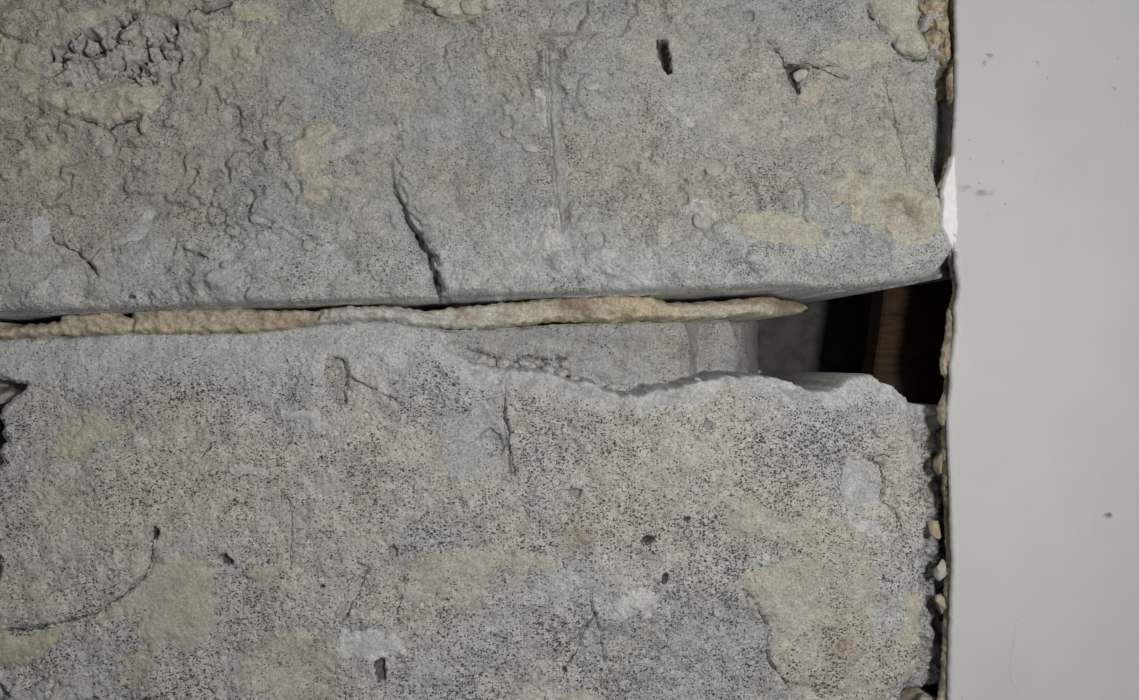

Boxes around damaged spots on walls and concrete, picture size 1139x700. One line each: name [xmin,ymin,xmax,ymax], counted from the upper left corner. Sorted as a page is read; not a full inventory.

crack [393,179,447,300]
spalling [445,321,762,393]
crack [9,527,156,631]